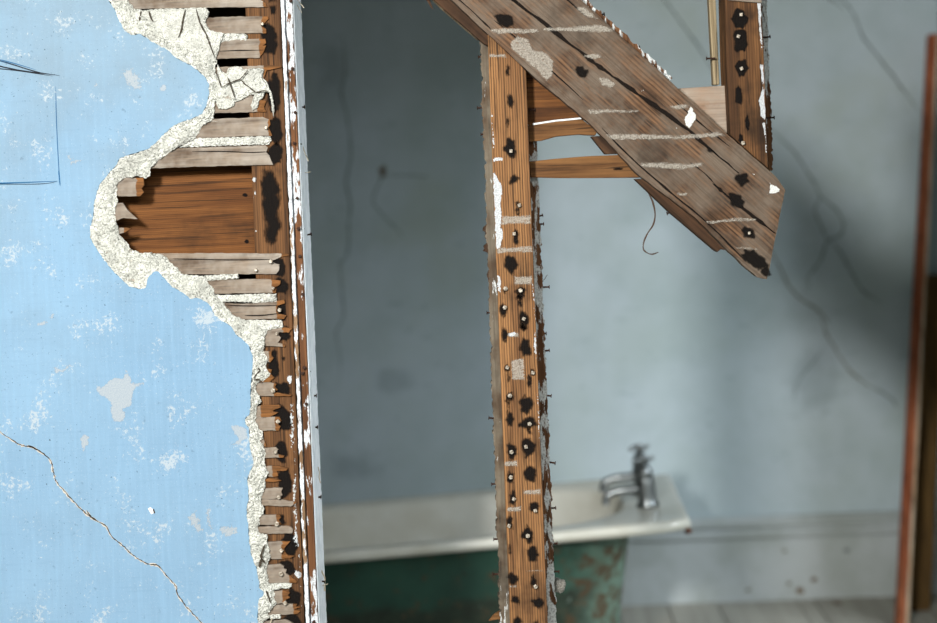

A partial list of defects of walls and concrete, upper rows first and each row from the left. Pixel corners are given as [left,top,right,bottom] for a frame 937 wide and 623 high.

flaking render [90,0,292,623]
crack [459,0,530,51]
crack [513,0,897,407]
crack [0,431,203,623]